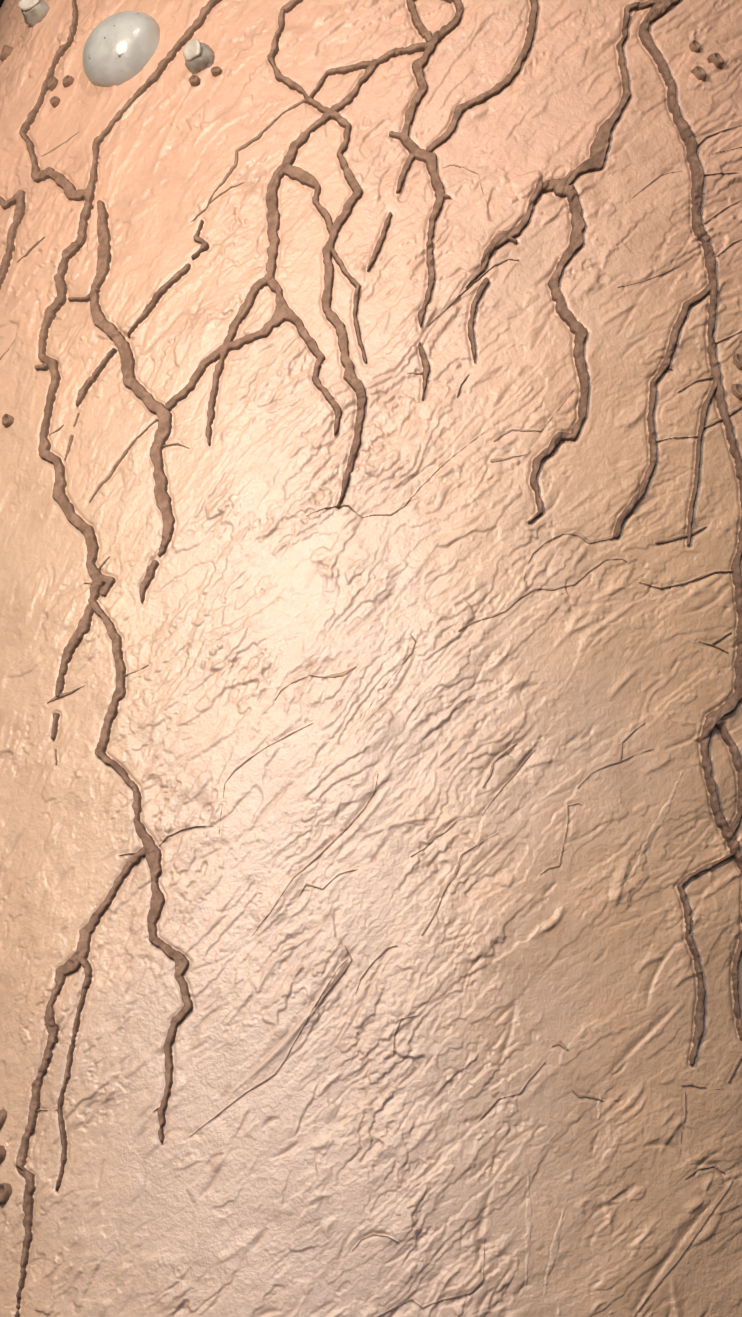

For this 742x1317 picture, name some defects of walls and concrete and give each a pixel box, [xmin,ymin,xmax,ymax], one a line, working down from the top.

crack [0,190,45,290]
crack [427,0,742,563]
crack [15,0,538,1317]
crack [458,558,627,632]
crack [540,724,654,875]
crack [638,517,742,1065]
crack [480,1041,568,1120]
crack [571,1089,620,1102]
crack [681,901,742,1141]